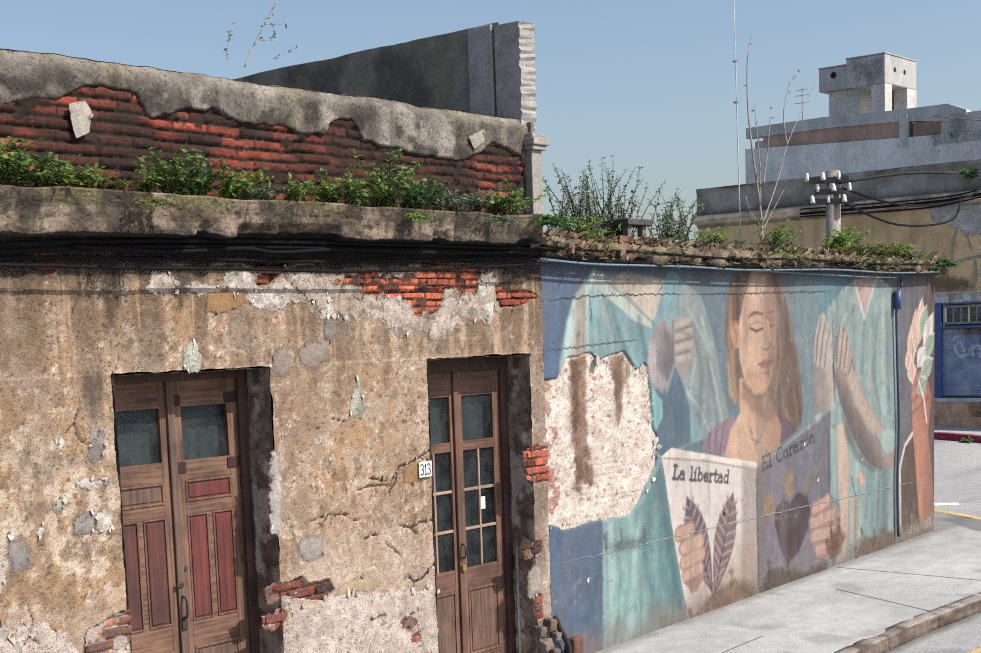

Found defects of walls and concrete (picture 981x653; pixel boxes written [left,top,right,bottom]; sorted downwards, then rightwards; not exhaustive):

spalling [0,85,526,215]
flaking render [930,204,981,236]
peeling [145,262,538,340]
peeling [183,338,203,373]
spalling [522,351,662,530]
peeling [0,527,16,594]
spalling [521,541,541,560]
peeling [0,609,132,653]
peeling [261,573,440,653]